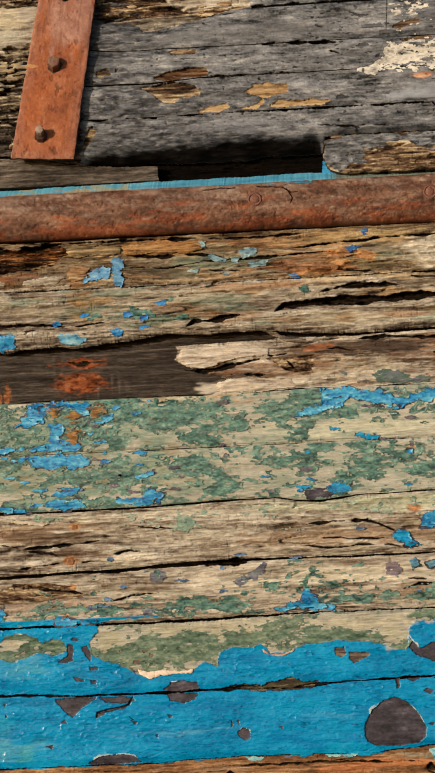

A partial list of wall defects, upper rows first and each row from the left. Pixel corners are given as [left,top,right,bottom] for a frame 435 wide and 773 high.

peeling [333,0,435,75]
peeling [141,67,208,104]
peeling [241,82,351,110]
peeling [83,257,124,288]
crack [69,233,435,312]
rust [0,379,14,408]
rust [37,356,116,445]
peeling [0,369,435,703]
crack [305,518,400,549]
crack [0,692,68,700]
peeling [55,696,135,724]
peeling [364,677,435,746]